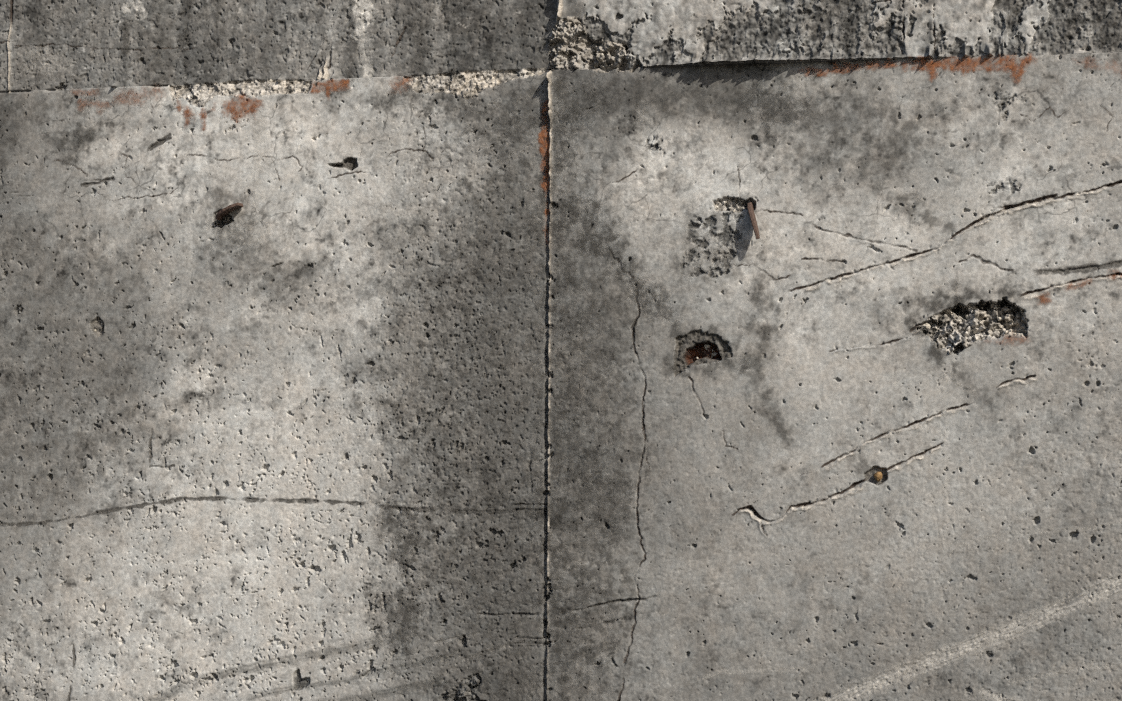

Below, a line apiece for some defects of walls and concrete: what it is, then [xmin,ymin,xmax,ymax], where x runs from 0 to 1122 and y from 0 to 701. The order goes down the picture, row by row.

corrosion [227,95,259,122]
corrosion [311,79,349,96]
corrosion [807,56,1032,81]
corrosion [539,100,550,190]
crack [738,169,1122,299]
spalling [918,299,1028,354]
crack [999,375,1036,388]
crack [610,251,650,701]
crack [732,404,969,536]